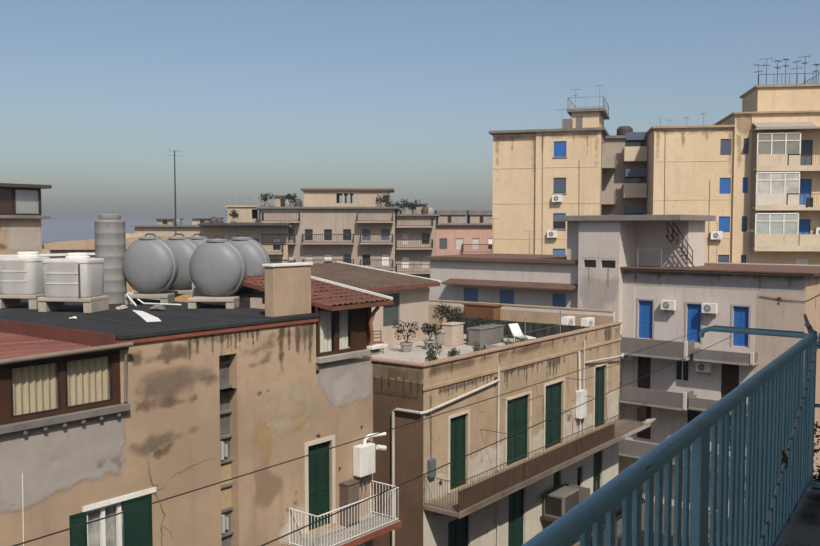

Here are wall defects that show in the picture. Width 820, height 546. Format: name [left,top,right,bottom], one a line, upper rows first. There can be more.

damp [128,323,315,413]
damp [373,327,619,400]